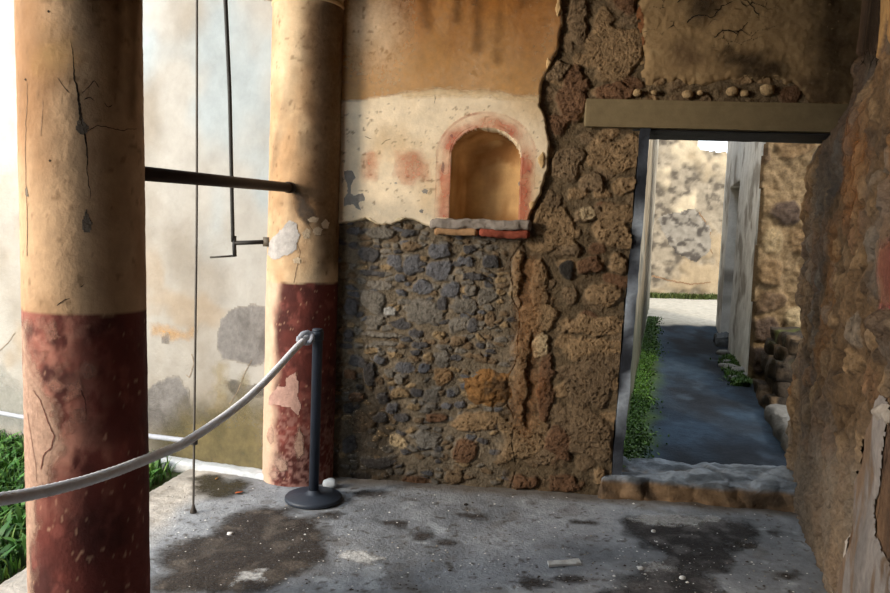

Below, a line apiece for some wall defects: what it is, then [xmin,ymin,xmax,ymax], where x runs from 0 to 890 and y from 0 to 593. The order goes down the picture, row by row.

crack [645,0,775,44]
crack [59,40,127,199]
leakage [295,0,562,265]
spalling [267,0,811,495]
spalling [217,303,265,367]
spalling [784,50,890,593]
peeling [223,372,301,415]
leakage [152,506,343,593]
leakage [413,532,457,545]
leakage [518,576,583,587]
leakage [598,516,777,593]